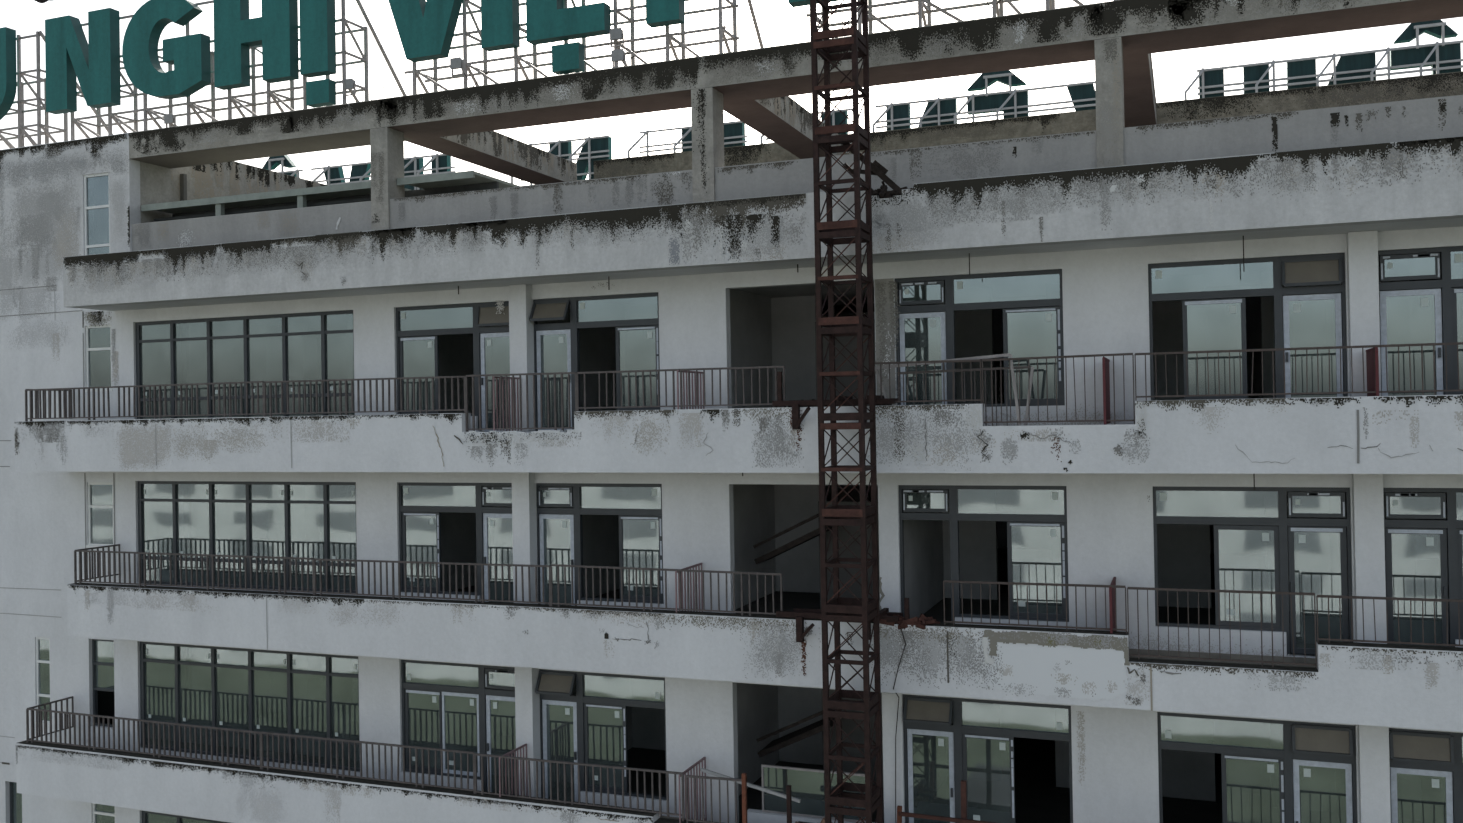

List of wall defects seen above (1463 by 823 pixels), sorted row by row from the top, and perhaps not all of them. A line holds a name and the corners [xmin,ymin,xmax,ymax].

water stain [0,0,1463,349]
water stain [867,281,1081,472]
water stain [14,410,678,469]
water stain [700,409,805,468]
water stain [1113,395,1463,465]
crack [1328,444,1463,458]
water stain [740,619,822,681]
spalling [871,625,1130,666]
water stain [1322,646,1463,673]